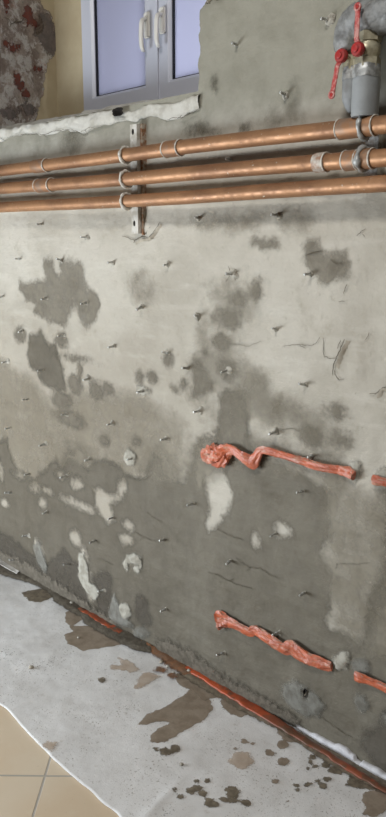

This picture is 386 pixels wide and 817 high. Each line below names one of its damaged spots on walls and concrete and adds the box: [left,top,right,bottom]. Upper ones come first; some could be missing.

peeling [0,0,56,129]
leakage [305,241,349,284]
crack [288,333,369,380]
crack [370,387,386,398]
leakage [0,260,386,772]